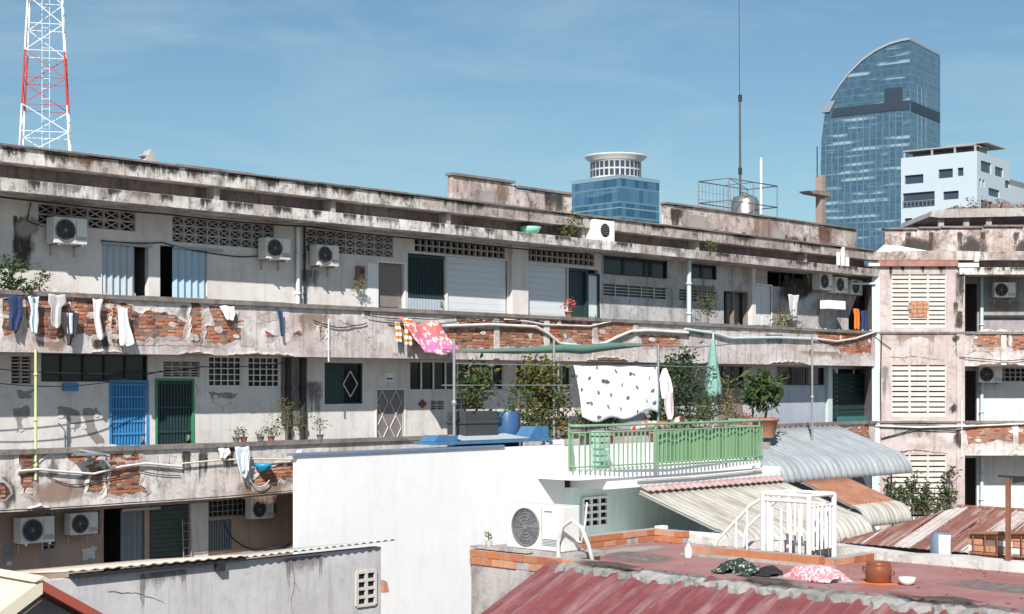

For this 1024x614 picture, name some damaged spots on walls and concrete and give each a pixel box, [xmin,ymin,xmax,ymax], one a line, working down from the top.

damp [45,152,102,165]
damp [119,161,209,176]
damp [222,173,279,186]
damp [296,182,355,194]
damp [643,208,683,231]
damp [13,216,33,264]
spalling [0,289,302,357]
spalling [969,329,1024,366]
spalling [57,406,152,500]
spalling [965,424,1024,447]
spalling [0,447,49,511]
spalling [244,456,293,491]